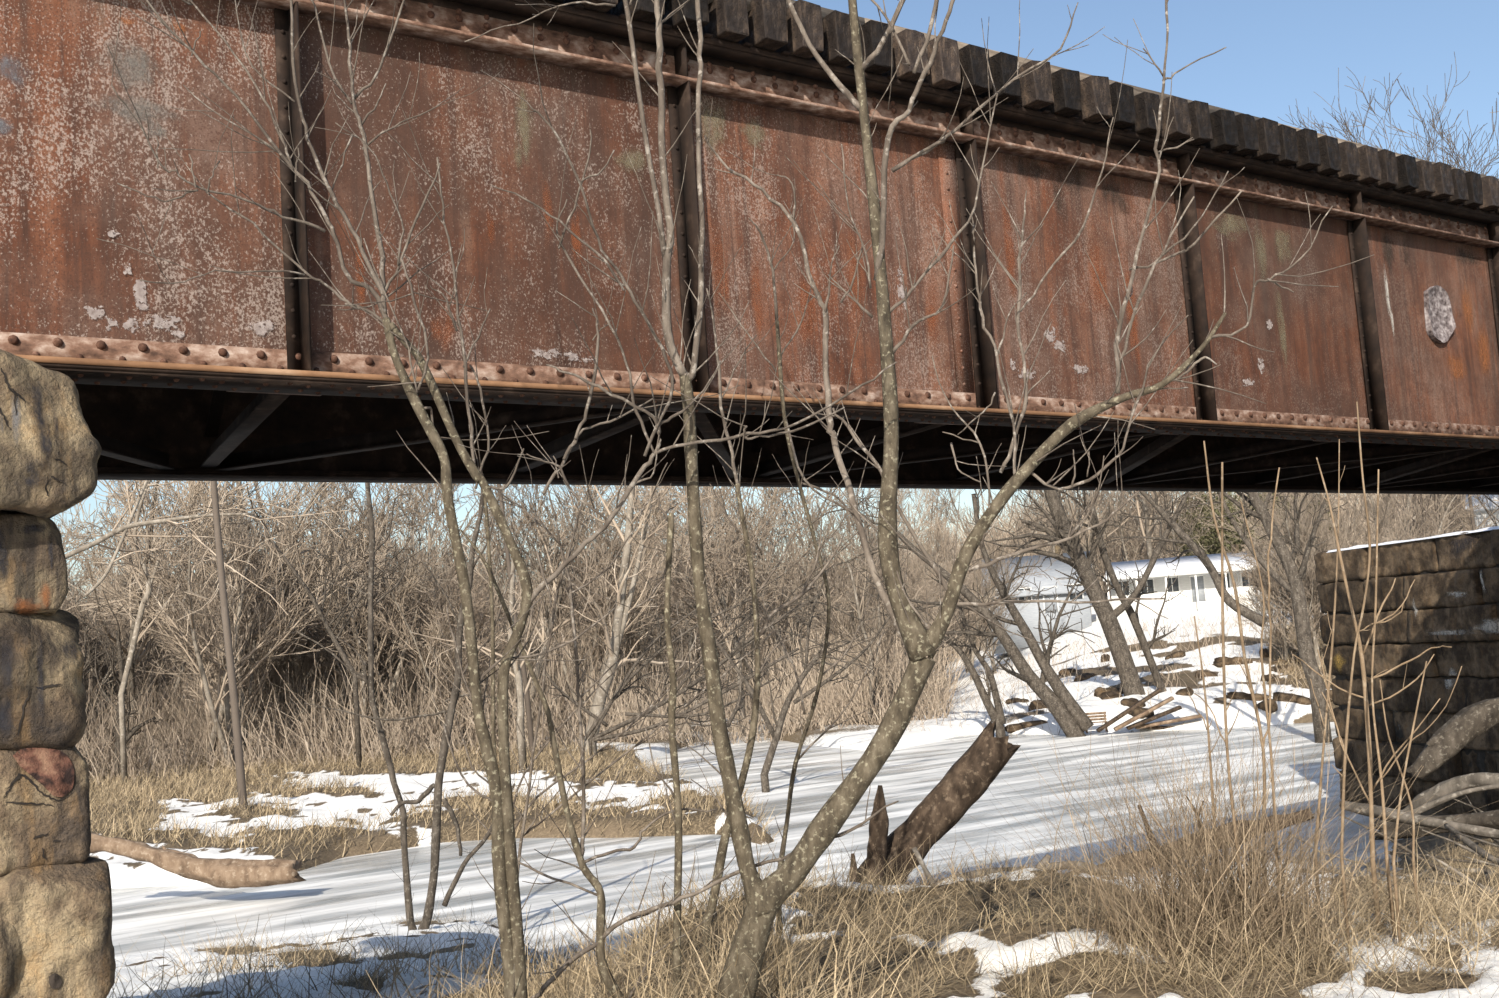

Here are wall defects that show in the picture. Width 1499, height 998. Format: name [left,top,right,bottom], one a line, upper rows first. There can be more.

peeling [84,263,186,338]
peeling [249,319,274,335]